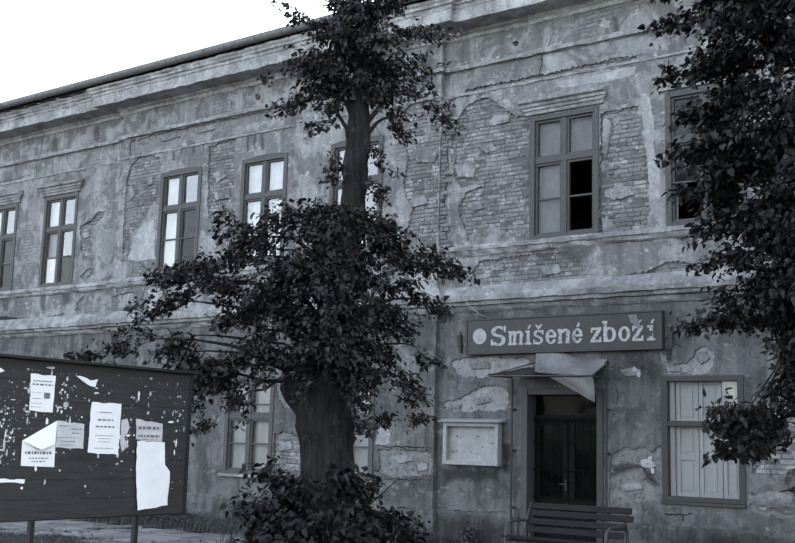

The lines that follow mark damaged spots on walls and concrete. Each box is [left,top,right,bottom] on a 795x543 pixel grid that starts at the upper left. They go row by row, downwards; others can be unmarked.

spalling [124,149,160,262]
spalling [207,139,237,219]
spalling [402,56,638,248]
spalling [600,92,660,233]
spalling [81,212,104,257]
spalling [472,252,586,285]
spalling [631,261,700,275]
spalling [443,356,534,413]
peeling [659,347,715,375]
spalling [375,426,435,478]
spalling [752,386,795,477]